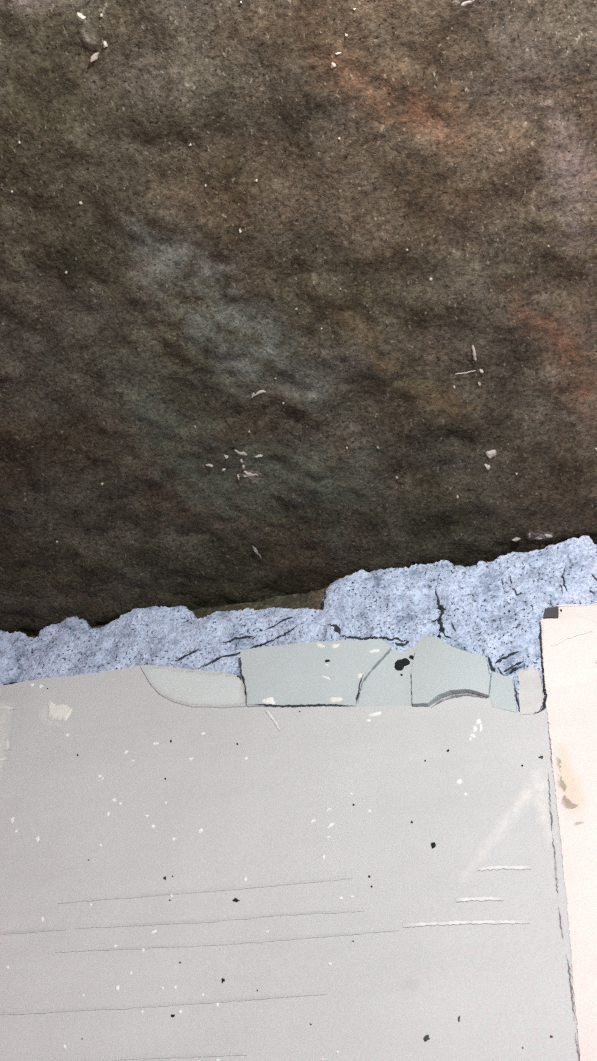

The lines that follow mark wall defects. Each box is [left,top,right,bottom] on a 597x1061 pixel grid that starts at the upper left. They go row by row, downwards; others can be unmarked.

leakage [0,0,99,39]
leakage [511,53,597,274]
leakage [79,179,410,532]
peeling [206,454,263,480]
flaking render [0,533,597,722]